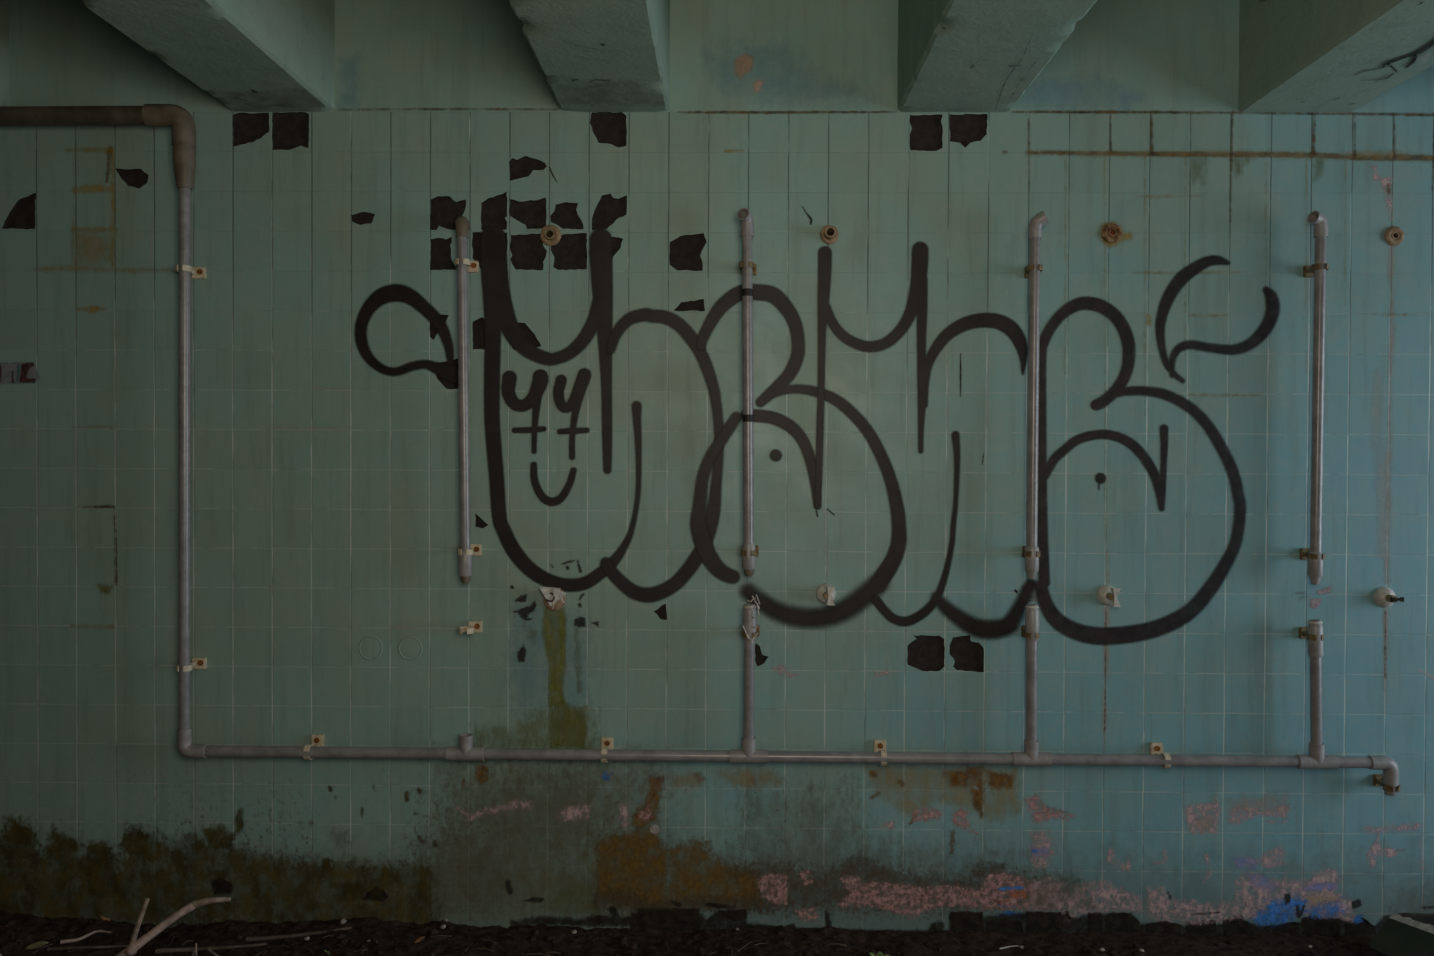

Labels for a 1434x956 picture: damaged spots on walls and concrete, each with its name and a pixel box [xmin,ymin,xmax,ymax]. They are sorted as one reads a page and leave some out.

peeling [232,90,309,150]
peeling [590,99,627,147]
peeling [910,114,988,151]
spalling [115,168,149,189]
spalling [2,193,36,229]
spalling [430,156,627,270]
peeling [669,233,707,271]
leakage [0,104,1399,796]
peeling [907,635,984,672]
rust [870,766,1016,825]
peeling [745,795,1434,934]